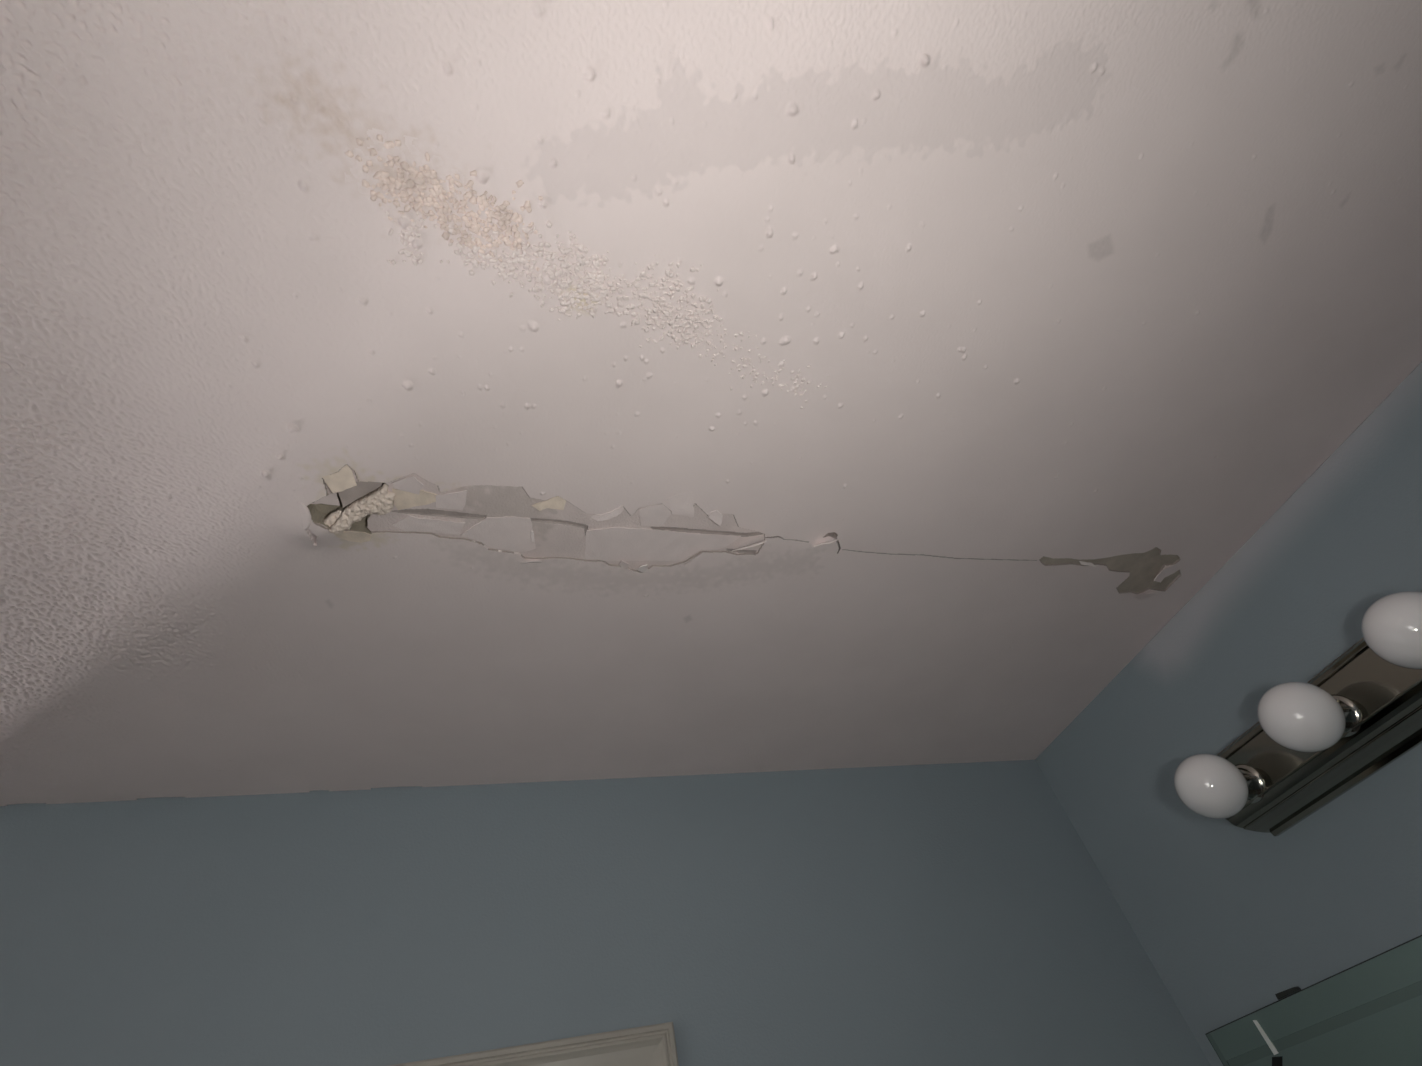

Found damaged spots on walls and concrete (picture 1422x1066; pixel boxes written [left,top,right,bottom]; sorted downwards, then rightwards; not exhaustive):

peeling [298,464,807,573]
crack [814,532,1037,561]
peeling [1039,547,1182,600]